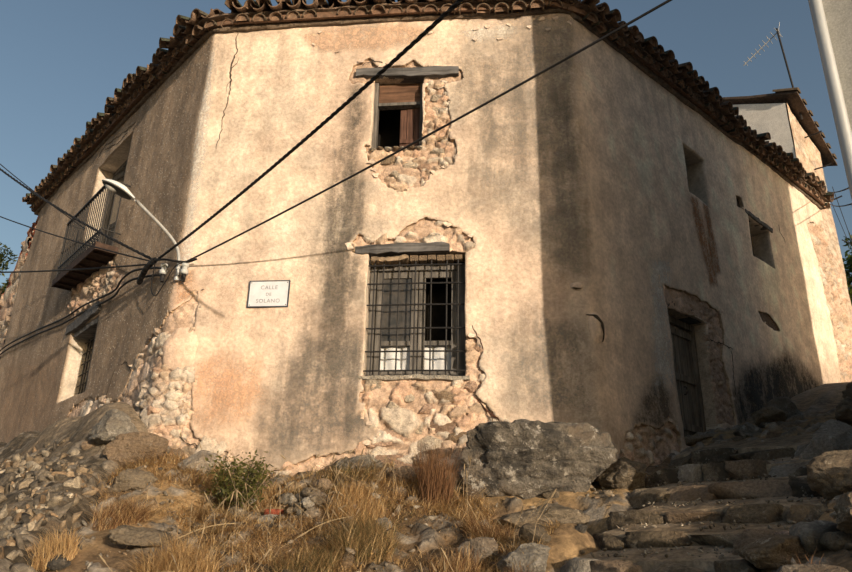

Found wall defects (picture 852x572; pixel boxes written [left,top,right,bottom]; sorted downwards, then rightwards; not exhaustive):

crack [216,32,239,147]
peeling [305,25,433,53]
spalling [349,59,465,191]
spalling [68,259,128,318]
spalling [68,289,235,469]
damp [263,146,365,451]
spalling [269,333,510,476]
spalling [345,218,475,260]
spalling [662,284,735,427]
damp [735,354,819,423]
spalling [807,220,852,383]